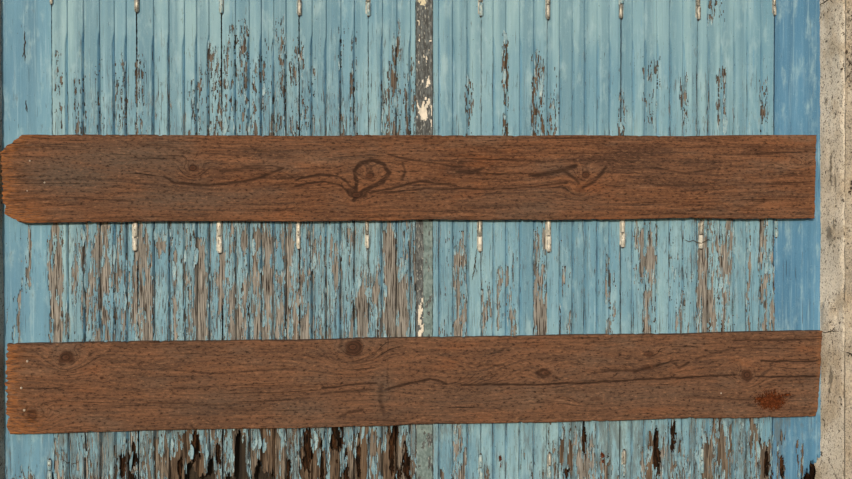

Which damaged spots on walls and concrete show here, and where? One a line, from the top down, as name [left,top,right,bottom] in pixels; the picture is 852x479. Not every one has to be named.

peeling [115,47,147,135]
peeling [501,30,509,136]
peeling [531,46,559,136]
peeling [47,219,468,343]
peeling [481,244,518,336]
peeling [533,220,547,335]
peeling [633,219,657,333]
peeling [668,218,735,334]
peeling [746,218,775,331]
peeling [53,424,491,479]
peeling [524,421,619,479]
corrosion [753,388,791,413]